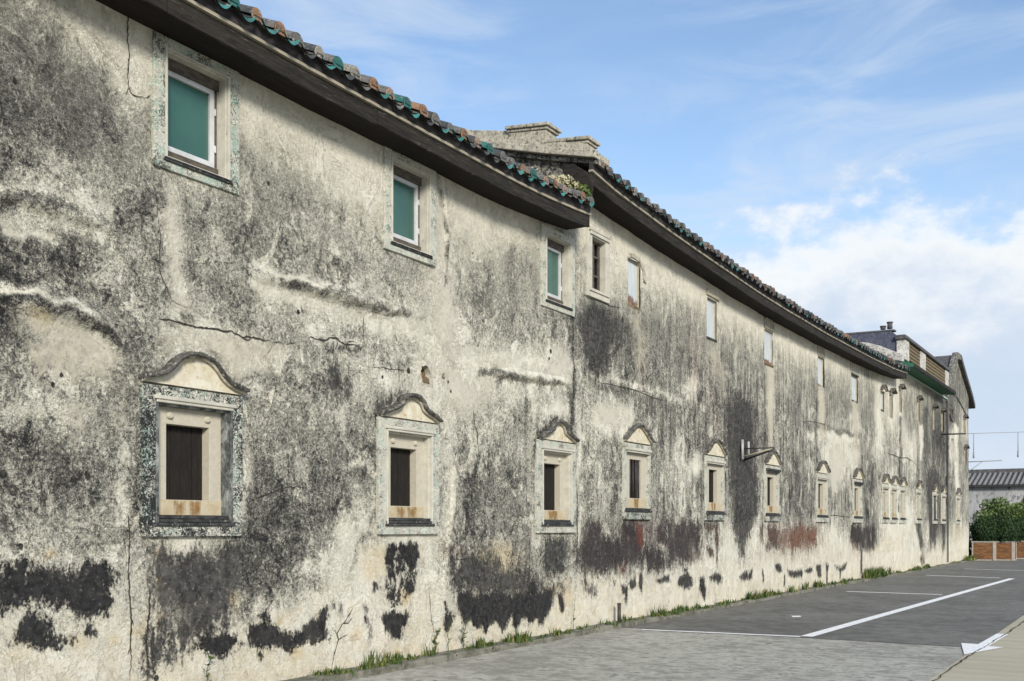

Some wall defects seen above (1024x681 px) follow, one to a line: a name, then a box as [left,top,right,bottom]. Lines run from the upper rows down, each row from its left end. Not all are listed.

crack [126,17,150,99]
crack [156,194,364,354]
damp [725,391,761,562]
damp [443,533,567,605]
mould [580,515,703,596]
rust [777,518,818,555]
damp [141,540,253,681]